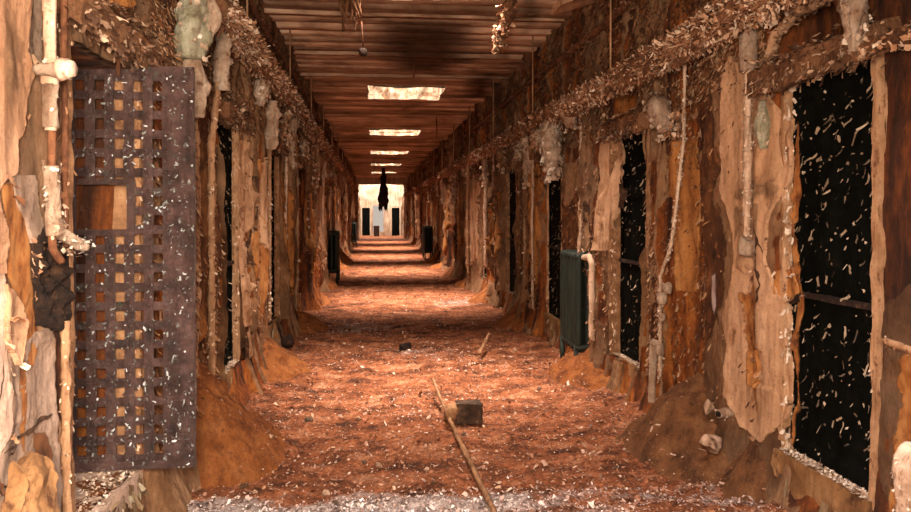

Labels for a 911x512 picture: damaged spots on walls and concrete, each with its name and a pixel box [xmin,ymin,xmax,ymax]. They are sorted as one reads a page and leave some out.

peeling [0,0,358,512]
peeling [410,0,911,501]
peeling [890,456,911,512]